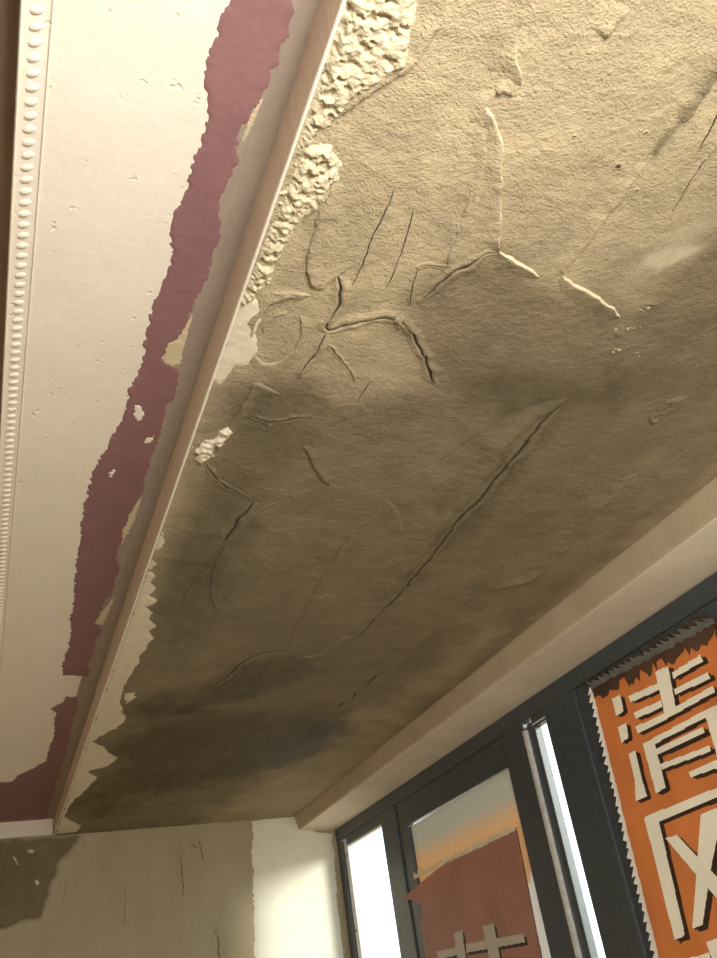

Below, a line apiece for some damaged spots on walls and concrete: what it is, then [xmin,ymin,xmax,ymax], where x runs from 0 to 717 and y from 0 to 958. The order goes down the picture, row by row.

peeling [61,0,295,676]
spalling [214,0,417,385]
crack [296,186,498,403]
crack [671,107,717,212]
crack [180,463,261,612]
crack [341,397,567,647]
peeling [56,532,165,834]